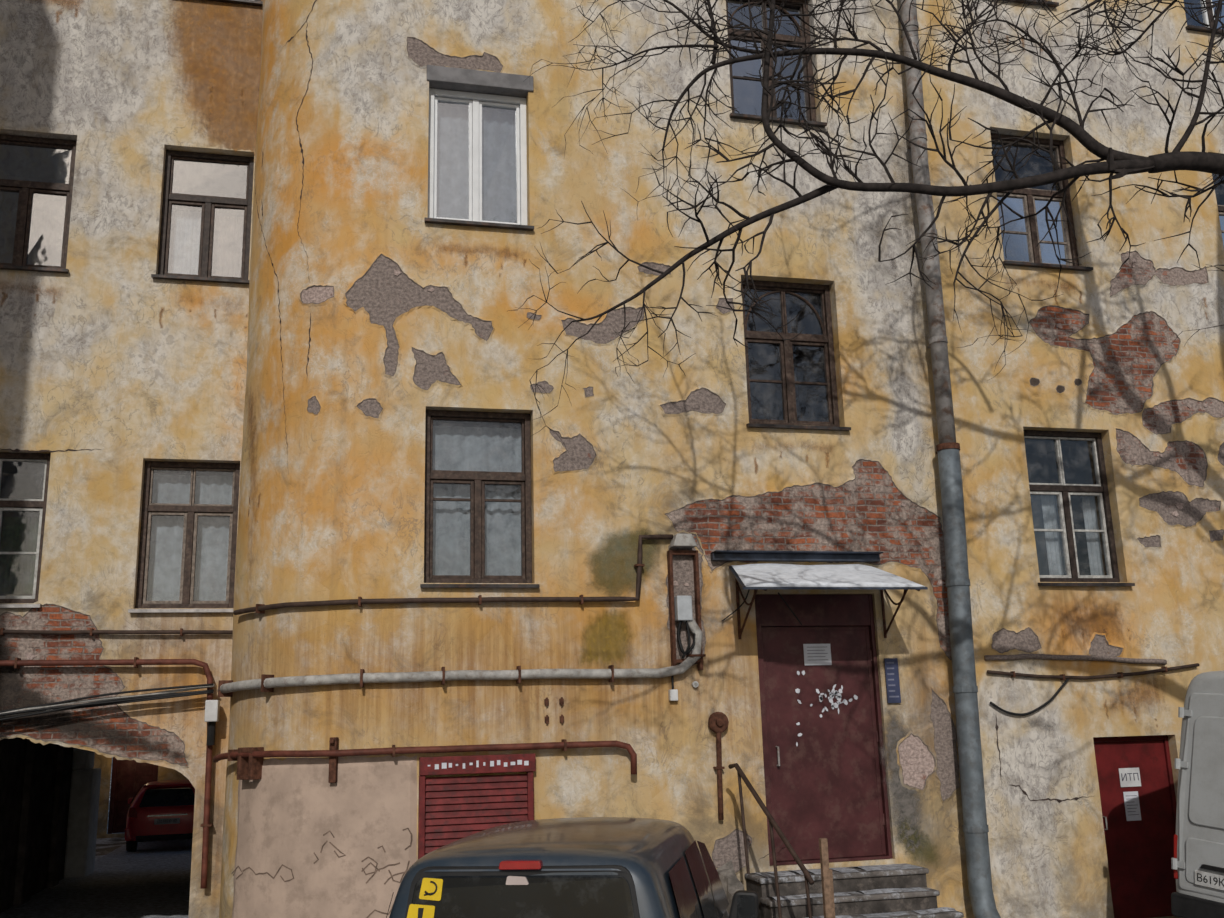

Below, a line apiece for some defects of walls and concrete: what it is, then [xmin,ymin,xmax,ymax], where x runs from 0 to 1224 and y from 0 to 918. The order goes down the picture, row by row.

crack [283,0,317,277]
crack [254,158,311,474]
flaking render [298,252,495,393]
flaking render [558,304,647,346]
flaking render [354,395,385,421]
flaking render [658,386,729,417]
flaking render [1027,303,1224,550]
flaking render [662,457,952,669]
flaking render [0,600,189,769]
damp [582,612,627,664]
flaking render [989,625,1042,655]
crack [995,717,1090,803]